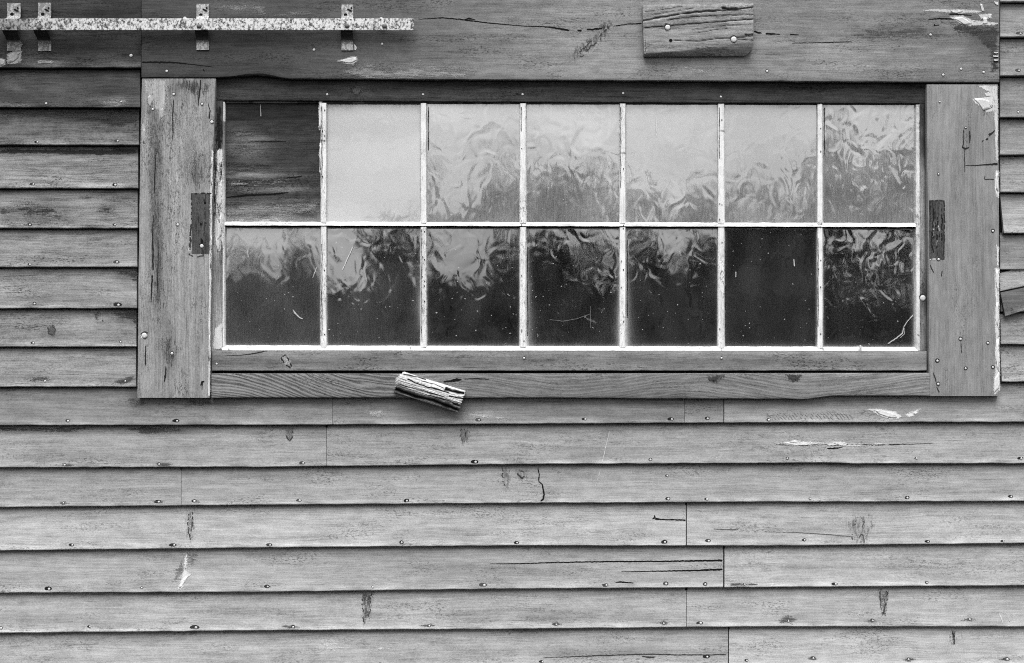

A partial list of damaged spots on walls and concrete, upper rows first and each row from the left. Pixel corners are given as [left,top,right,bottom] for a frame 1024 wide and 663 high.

crack [424,17,642,31]
peeling [923,1,998,26]
peeling [973,85,1000,198]
peeling [993,244,1001,394]
peeling [868,408,919,419]
crack [827,442,926,450]
peeling [178,553,191,590]
crack [491,559,723,583]